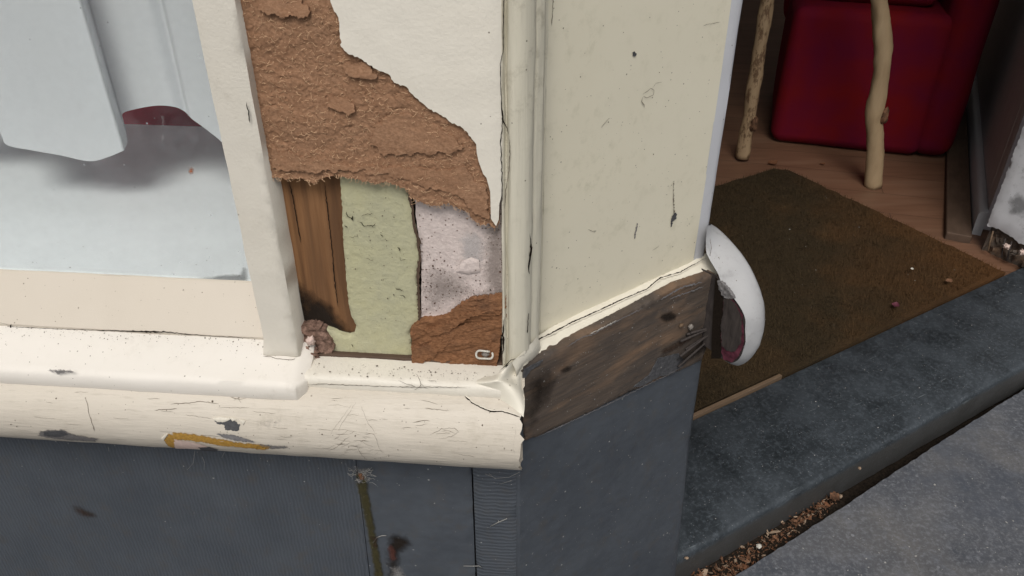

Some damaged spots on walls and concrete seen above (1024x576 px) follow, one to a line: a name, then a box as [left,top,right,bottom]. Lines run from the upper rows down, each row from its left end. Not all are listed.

peeling [258,0,311,19]
peeling [343,62,378,80]
peeling [271,113,490,220]
crack [501,237,746,369]
peeling [411,304,502,364]
peeling [38,430,97,442]
peeling [161,417,287,452]
crack [153,373,521,468]